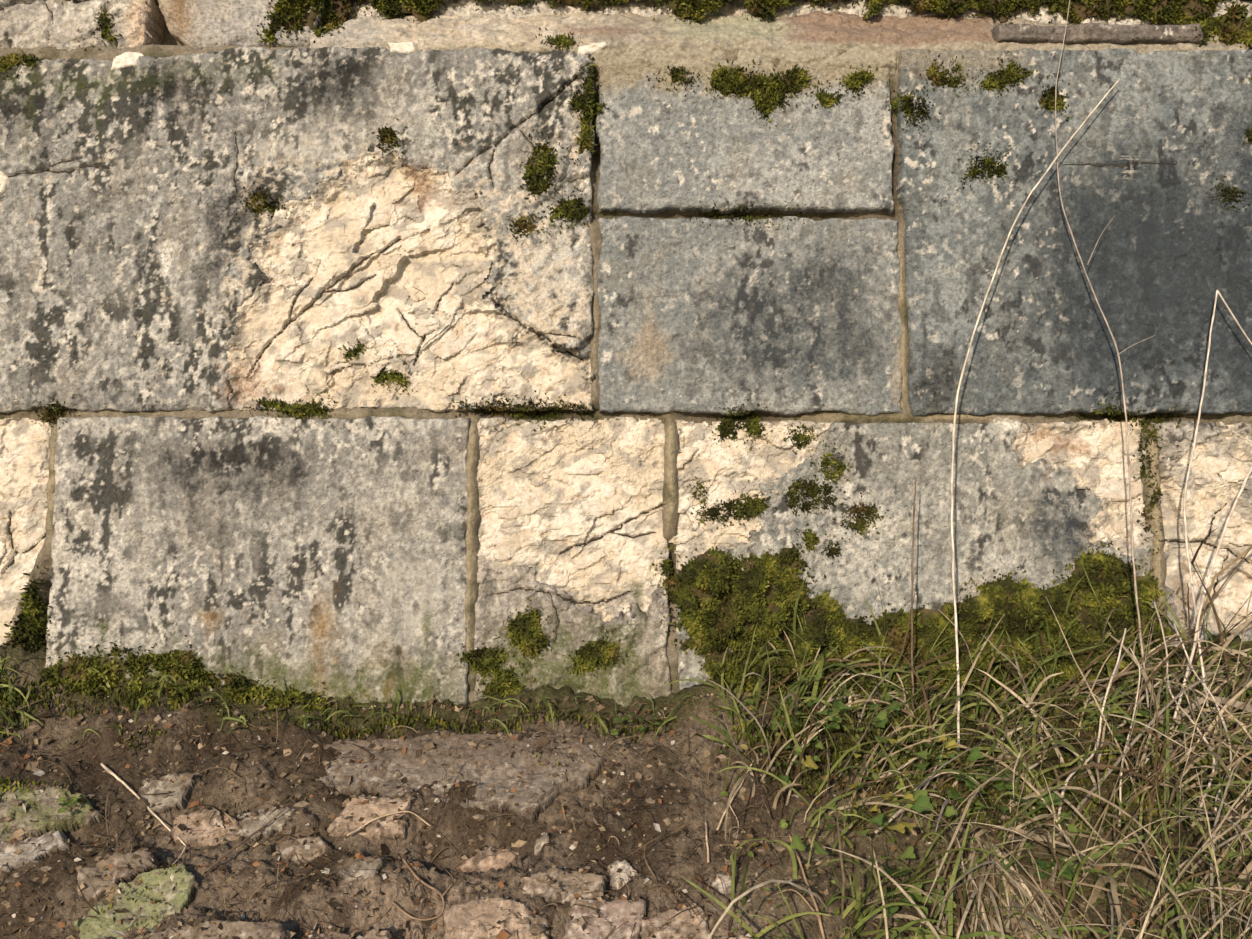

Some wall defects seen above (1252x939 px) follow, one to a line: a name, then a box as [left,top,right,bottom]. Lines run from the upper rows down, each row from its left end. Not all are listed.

crack [7,159,111,178]
crack [247,239,401,378]
crack [397,283,454,365]
crack [560,503,667,554]
crack [1158,503,1252,605]
crack [487,587,633,646]